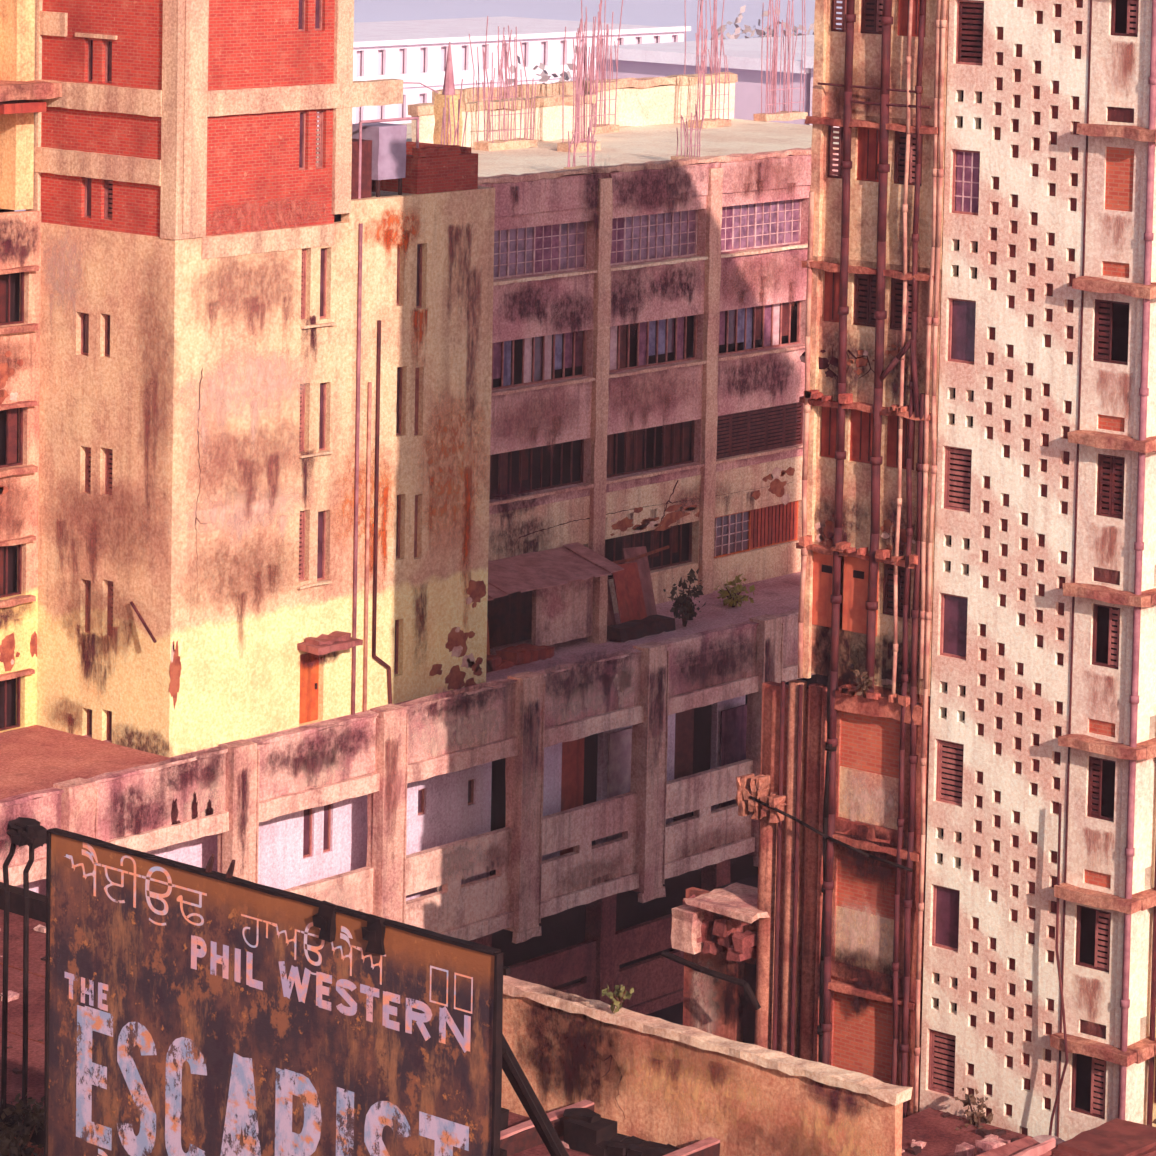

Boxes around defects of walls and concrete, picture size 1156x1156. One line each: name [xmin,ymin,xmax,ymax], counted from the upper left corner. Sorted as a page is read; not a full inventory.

corrosion [366,210,419,253]
damp [209,264,288,327]
damp [504,288,593,332]
corrosion [426,401,482,583]
peeling [610,505,699,536]
peeling [752,467,795,505]
damp [213,557,277,629]
spalling [0,631,37,672]
damp [68,592,131,682]
peeling [429,627,483,690]
spalling [683,895,757,962]
damp [519,982,874,1156]